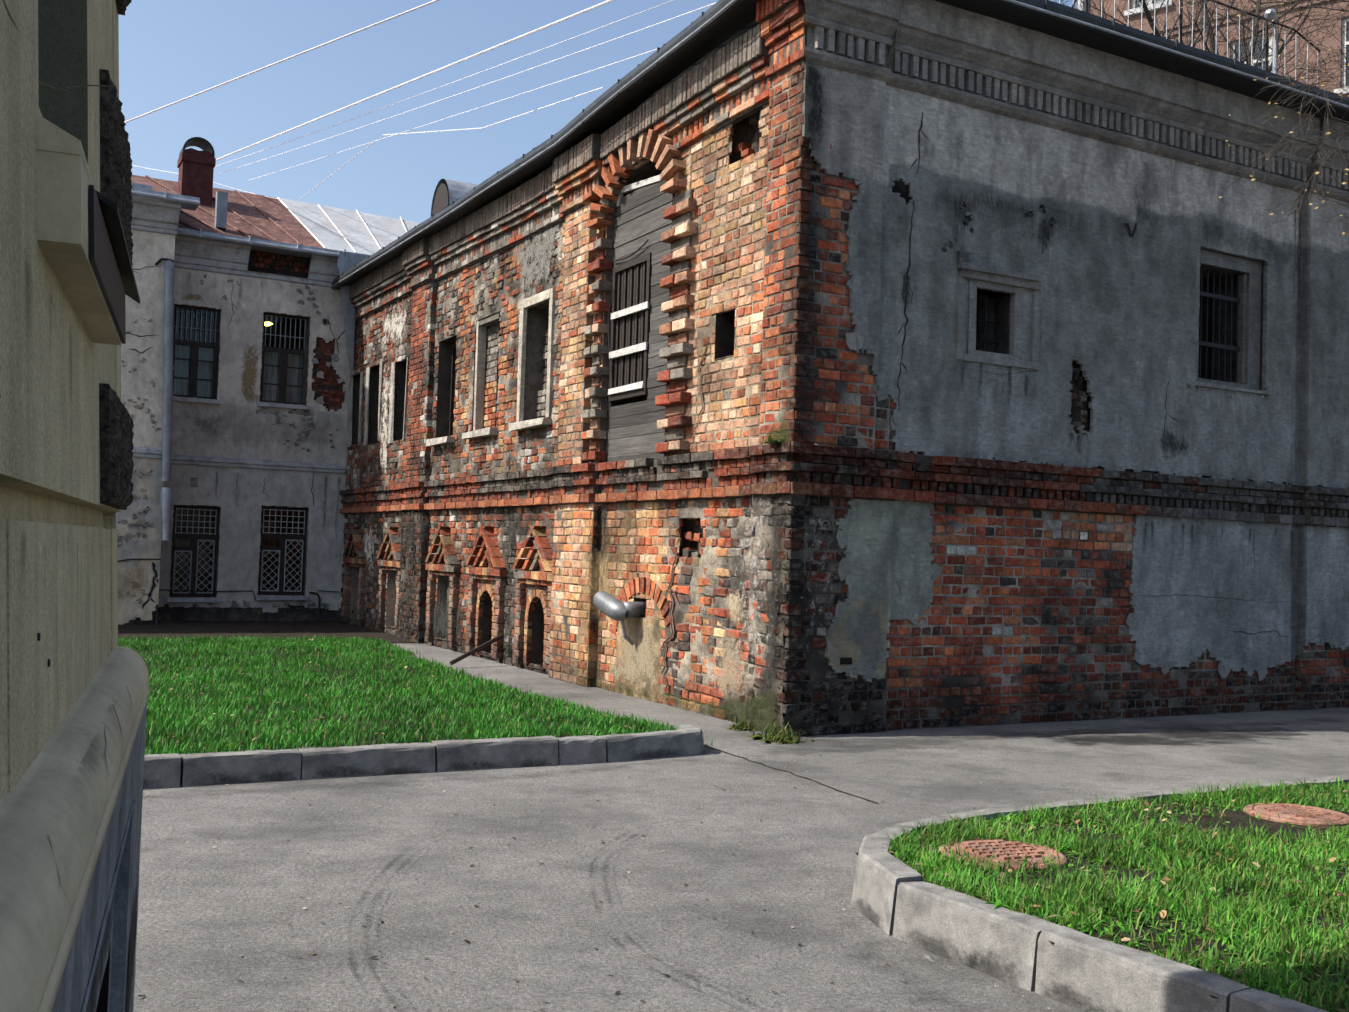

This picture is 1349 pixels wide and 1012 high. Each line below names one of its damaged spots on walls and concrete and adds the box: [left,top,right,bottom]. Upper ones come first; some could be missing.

flaking render [892,179,911,203]
crack [896,112,929,412]
peeling [845,332,864,350]
peeling [311,358,343,383]
flaking render [1069,360,1091,435]
spalling [826,637,857,679]